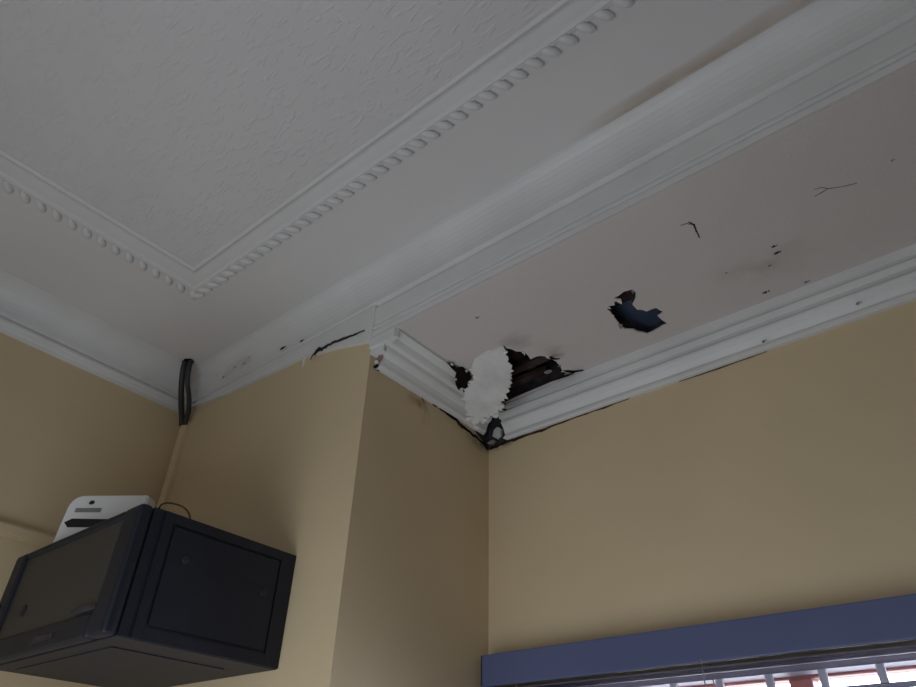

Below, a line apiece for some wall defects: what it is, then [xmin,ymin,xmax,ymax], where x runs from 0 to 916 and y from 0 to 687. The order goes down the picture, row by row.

spalling [609,290,666,333]
crack [310,330,365,360]
flaking render [447,345,574,450]